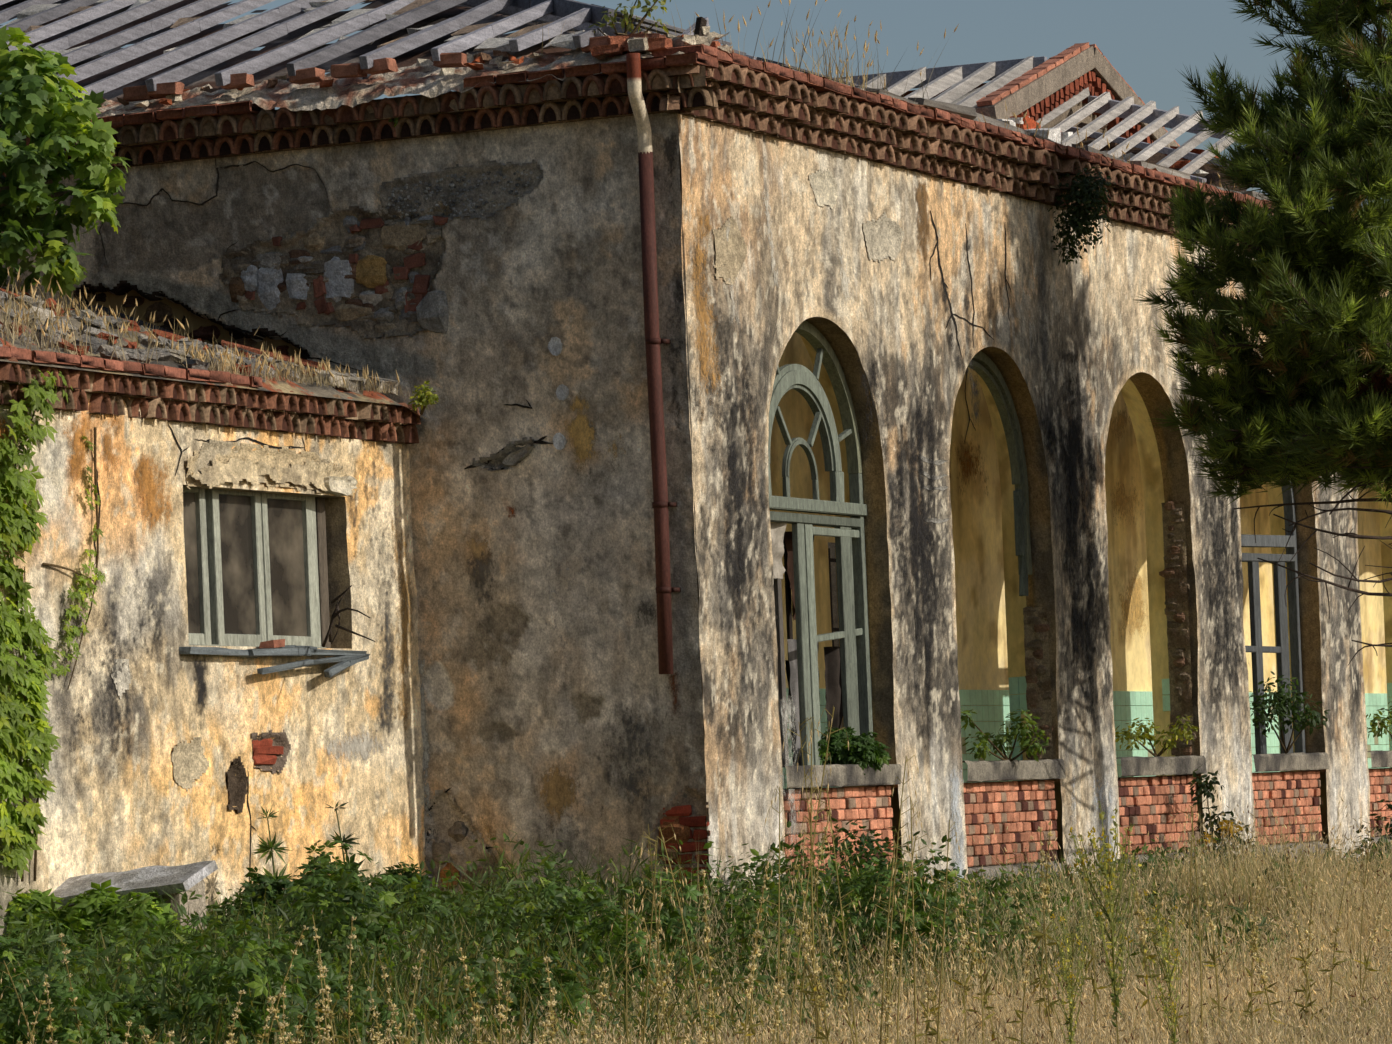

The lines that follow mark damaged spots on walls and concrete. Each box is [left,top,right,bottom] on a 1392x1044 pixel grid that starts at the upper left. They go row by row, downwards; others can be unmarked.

flaking render [73,158,543,360]
water stain [663,133,678,218]
crack [930,210,1011,442]
water stain [75,570,163,765]
peeling [171,737,209,791]
water stain [193,655,207,711]
flaking render [226,729,291,813]
flaking render [651,786,712,906]
water stain [666,210,768,707]
water stain [858,360,945,750]
water stain [1040,347,1149,728]
water stain [1194,438,1245,707]